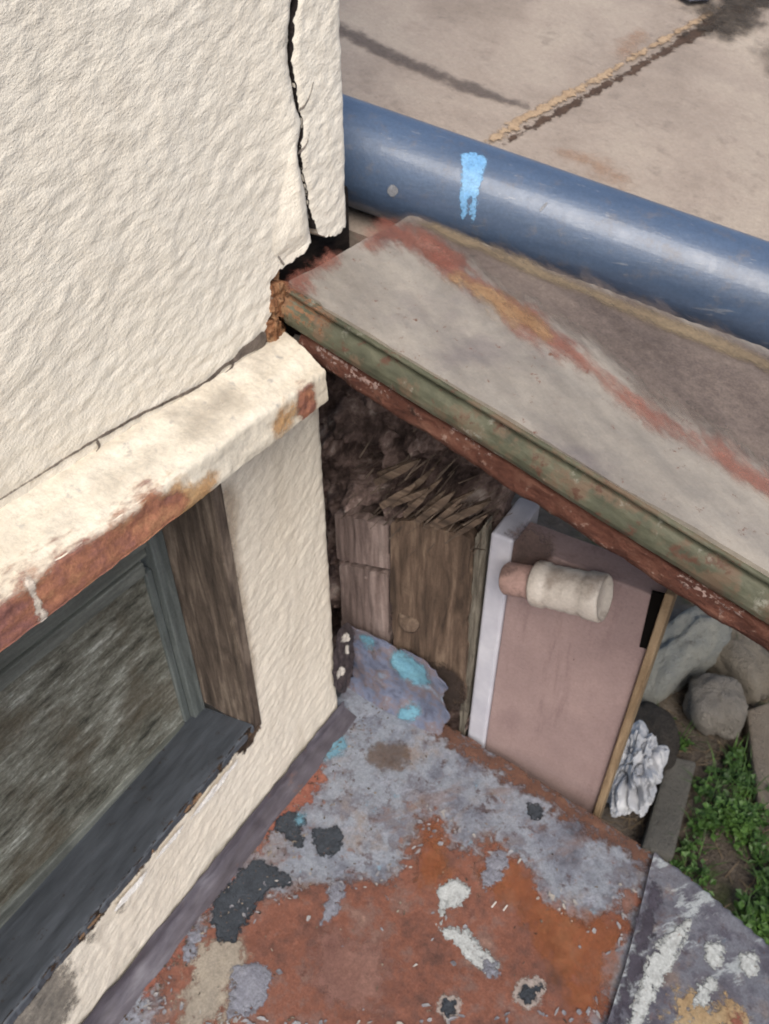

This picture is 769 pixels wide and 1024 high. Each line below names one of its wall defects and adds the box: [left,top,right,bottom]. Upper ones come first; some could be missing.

crack [287,0,317,231]
rust [274,384,317,434]
rust [365,220,669,425]
rust [708,442,769,494]
rust [0,474,216,652]
rust [253,764,328,859]
rust [434,724,670,871]
rust [141,804,642,1024]